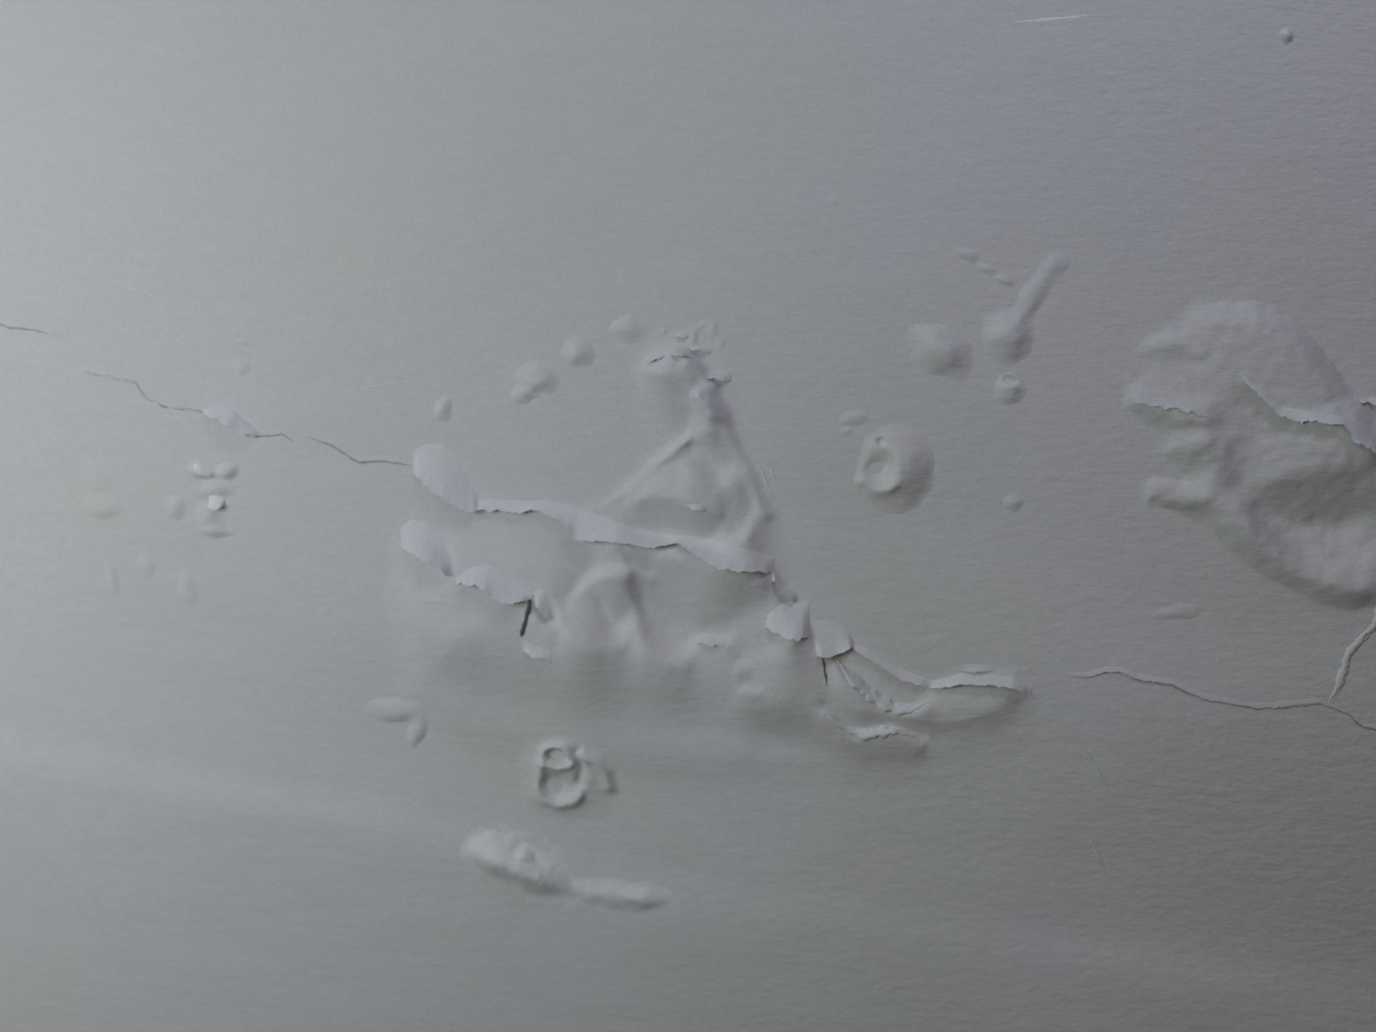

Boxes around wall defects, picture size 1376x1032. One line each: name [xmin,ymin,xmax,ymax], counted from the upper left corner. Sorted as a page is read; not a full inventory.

crack [82,370,414,466]
flaking render [381,327,1042,792]
crack [1068,609,1376,731]